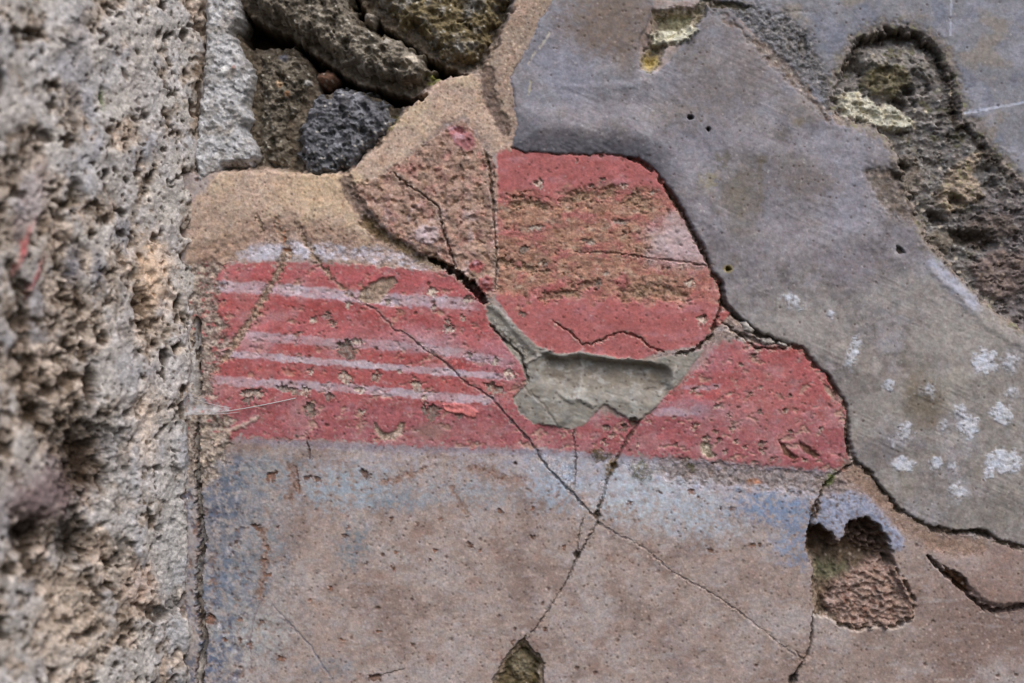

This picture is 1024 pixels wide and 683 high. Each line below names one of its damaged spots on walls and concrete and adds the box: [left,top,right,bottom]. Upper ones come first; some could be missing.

spalling [480,66,511,136]
spalling [651,0,1024,333]
crack [394,146,530,384]
crack [574,251,713,270]
spalling [188,119,716,486]
crack [552,299,762,357]
leakage [900,370,951,427]
leakage [849,429,910,472]
crack [393,329,807,683]
spalling [654,423,992,593]
crack [888,497,1024,551]
crack [962,590,1024,615]